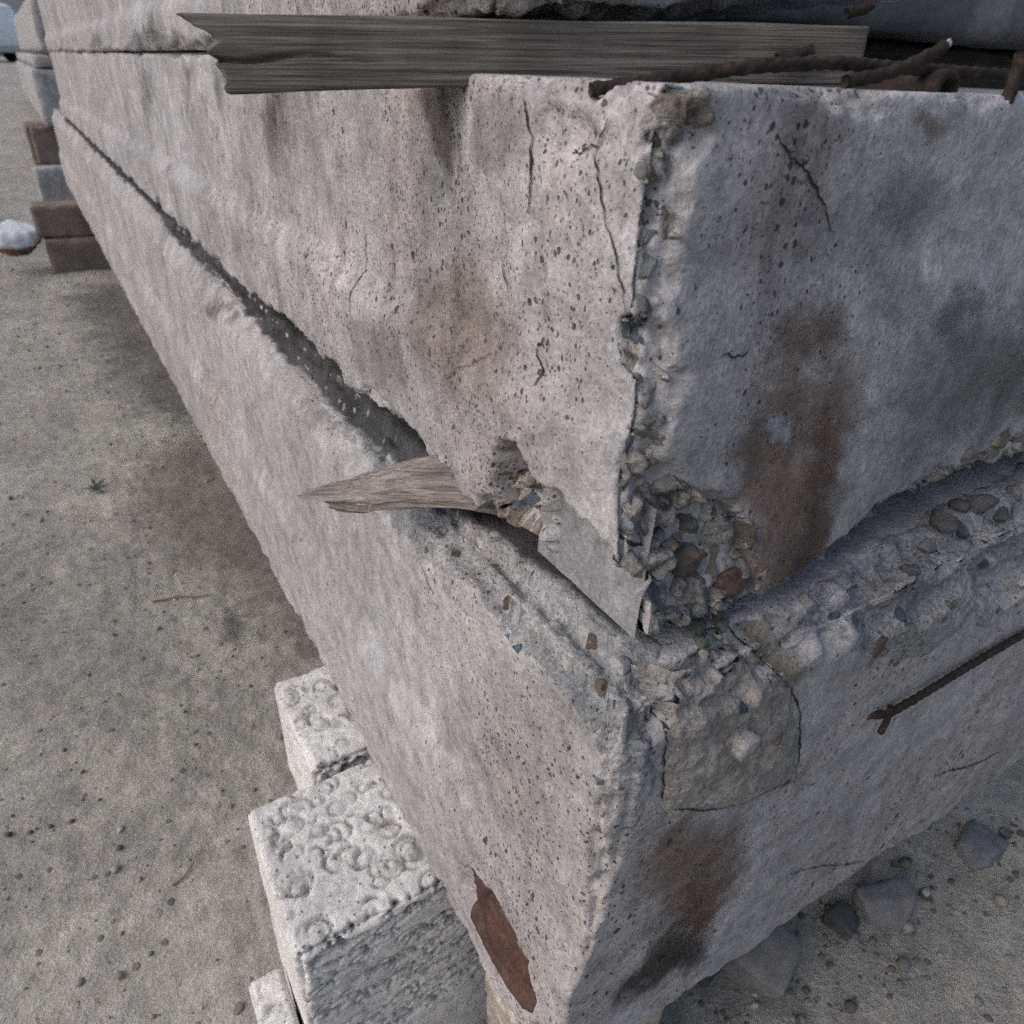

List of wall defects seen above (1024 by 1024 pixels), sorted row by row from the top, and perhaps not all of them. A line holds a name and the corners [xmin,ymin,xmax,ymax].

crack [523,100,533,212]
crack [573,119,626,311]
spalling [634,198,682,278]
spalling [634,81,715,183]
crack [778,136,833,232]
spalling [329,394,398,470]
corrosion [741,381,849,594]
spalling [385,291,758,836]
corrosion [651,823,740,932]
corrosion [470,868,537,1013]